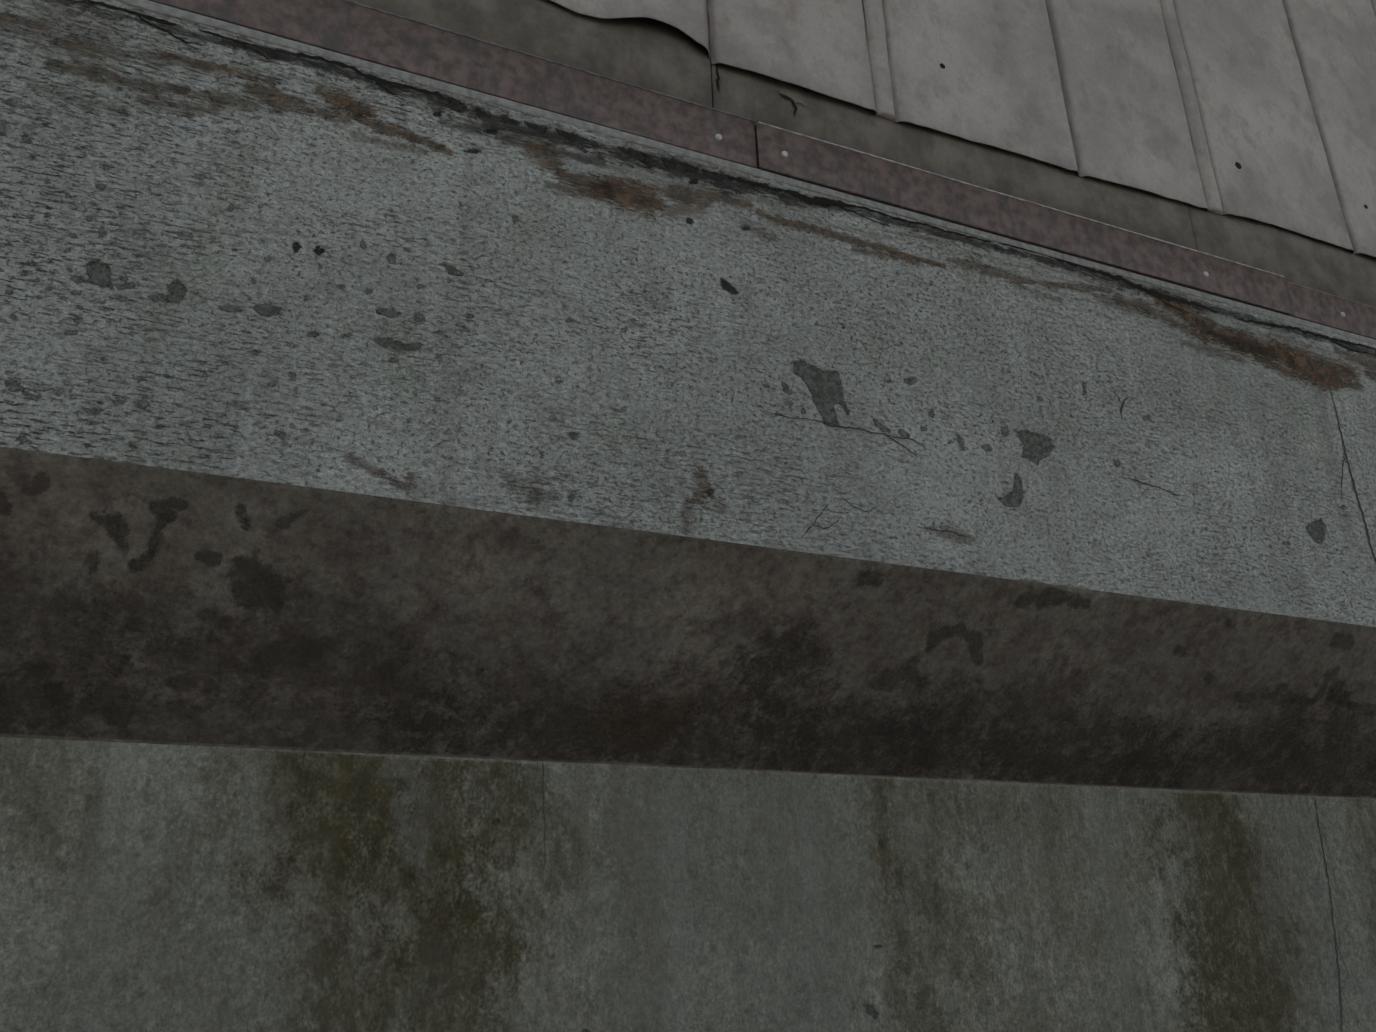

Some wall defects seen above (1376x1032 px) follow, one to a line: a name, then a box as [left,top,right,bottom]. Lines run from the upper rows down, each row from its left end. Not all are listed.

rust [47,59,190,95]
rust [158,50,455,156]
rust [525,140,946,268]
spalling [762,359,850,427]
crack [730,176,1376,562]
rust [1151,290,1376,394]
spalling [948,426,1055,507]
spalling [1305,518,1327,544]
damp [397,759,523,1032]
crack [1315,800,1352,1032]